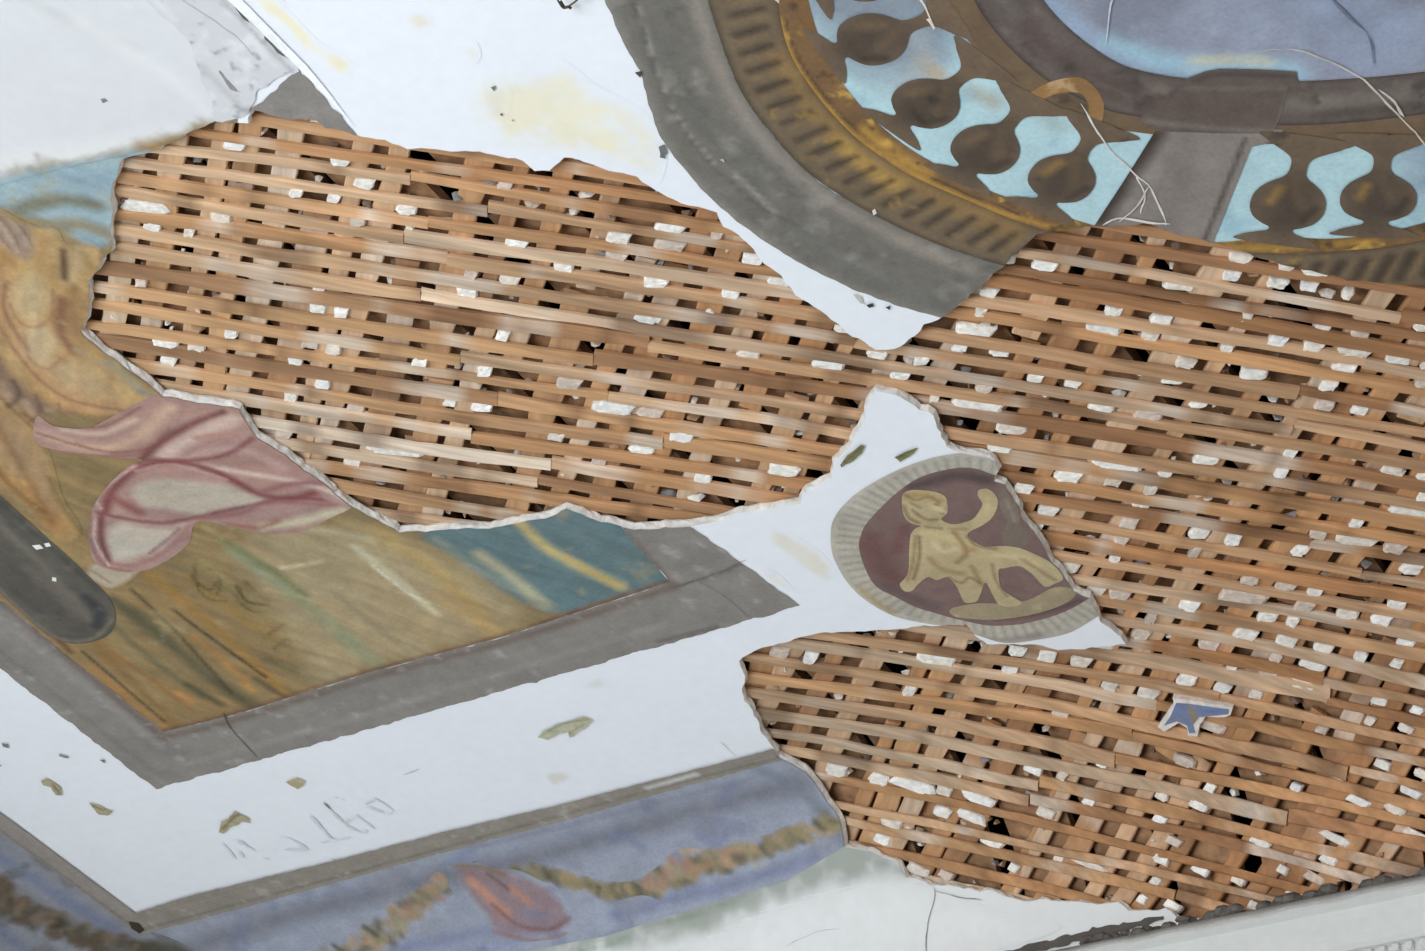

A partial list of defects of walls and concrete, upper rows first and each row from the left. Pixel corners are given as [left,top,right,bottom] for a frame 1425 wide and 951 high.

crack [1260,0,1425,145]
flaking render [149,110,745,242]
flaking render [81,154,1425,918]